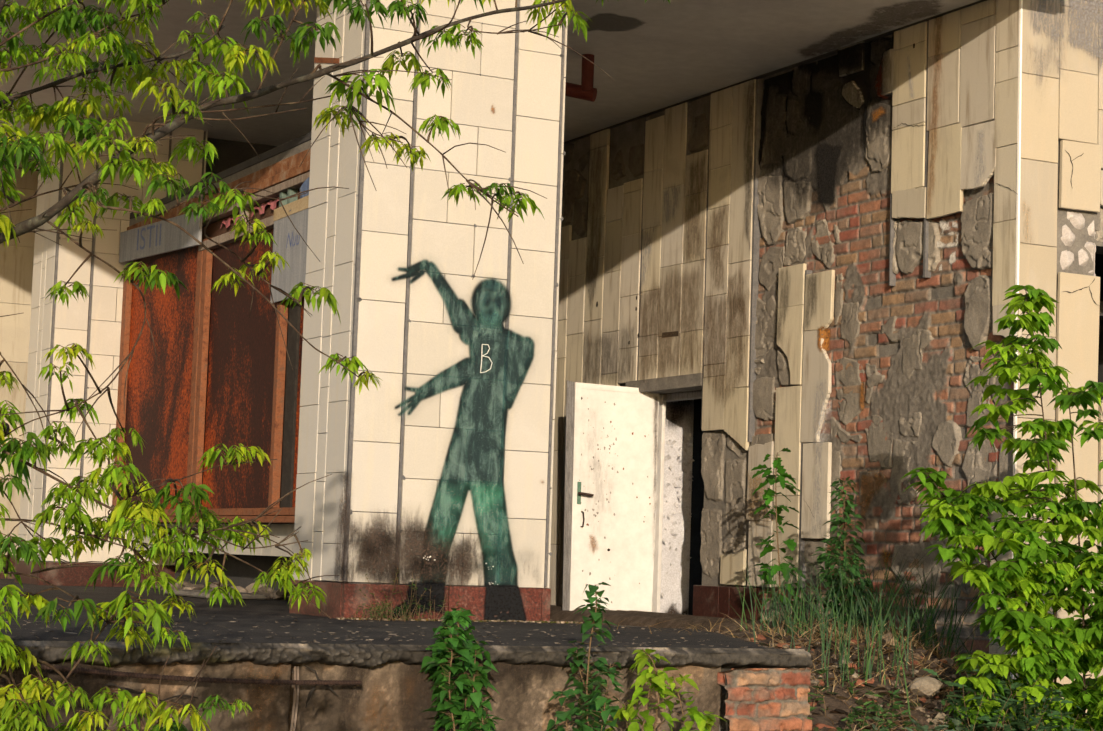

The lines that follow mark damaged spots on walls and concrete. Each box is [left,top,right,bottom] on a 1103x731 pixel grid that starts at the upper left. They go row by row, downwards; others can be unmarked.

peeling [800,0,939,64]
leakage [1031,0,1103,65]
leakage [746,88,755,234]
flaking render [865,104,892,173]
leakage [666,158,725,286]
flaking render [892,219,942,274]
flaking render [662,67,862,579]
flaking render [880,316,934,379]
flaking render [932,192,1013,498]
leakage [339,474,477,593]
flaking render [804,357,962,595]